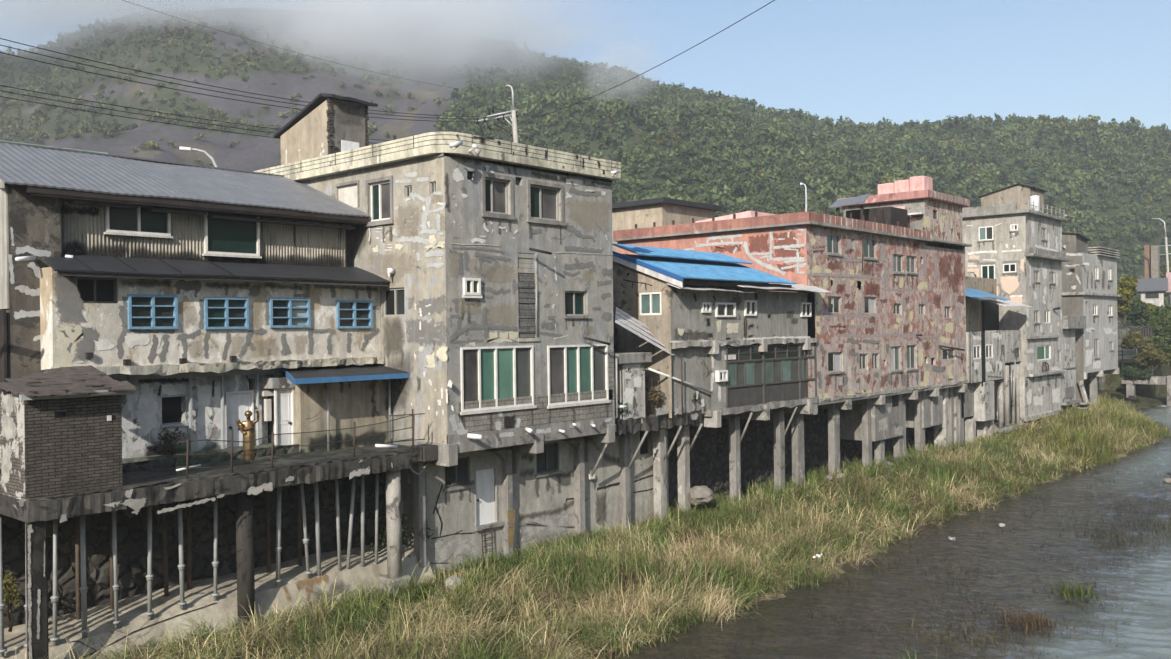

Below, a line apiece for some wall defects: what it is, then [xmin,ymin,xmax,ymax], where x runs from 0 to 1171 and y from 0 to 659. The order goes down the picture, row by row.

damp [122,279,170,287]
damp [63,241,343,267]
damp [352,225,393,252]
peeling [369,168,468,259]
peeling [471,221,518,244]
peeling [557,175,606,199]
peeling [743,248,866,345]
peeling [51,305,179,369]
damp [324,320,421,417]
peeling [414,346,454,416]
peeling [469,331,532,346]
crack [430,484,475,564]